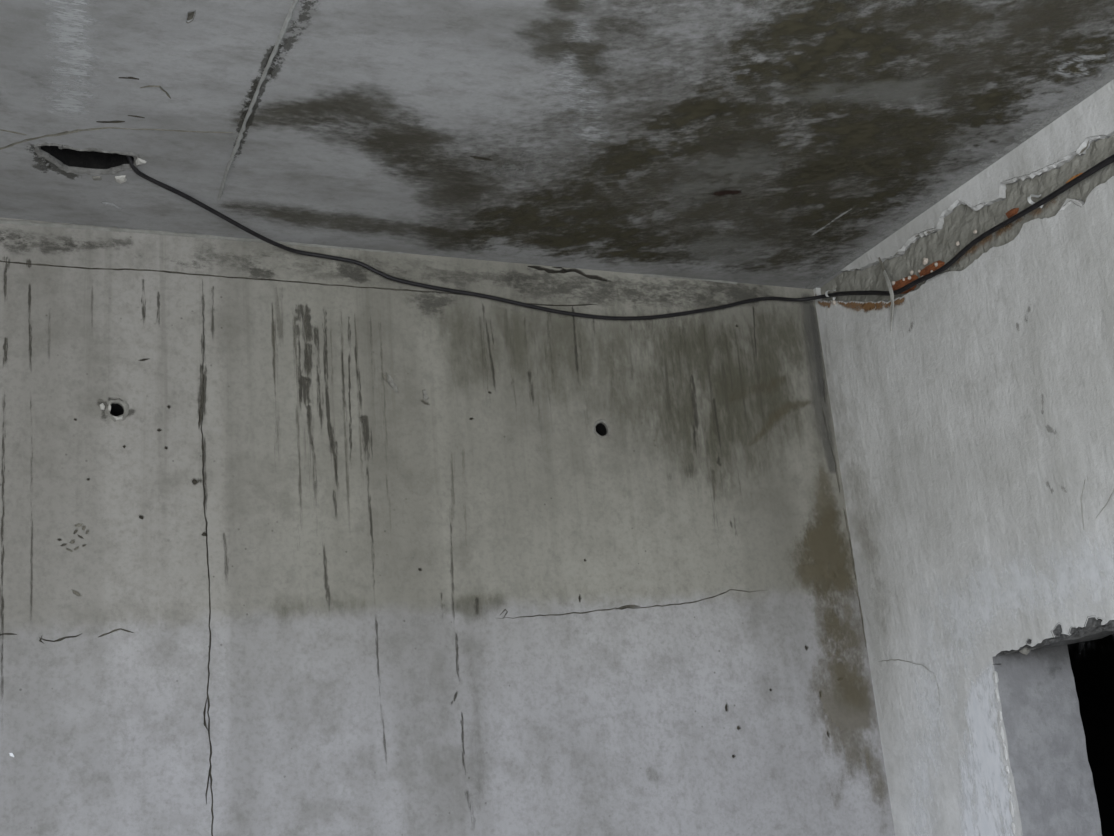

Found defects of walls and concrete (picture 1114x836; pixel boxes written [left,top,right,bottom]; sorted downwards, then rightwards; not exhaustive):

peeling [1057,55,1105,77]
crack [119,77,171,99]
crack [0,115,233,150]
water stain [226,0,1114,289]
flaking render [821,135,1114,308]
crack [527,266,611,306]
rust [815,295,904,311]
water stain [296,305,372,512]
crack [500,589,767,619]
flaking render [1047,616,1114,643]
water stain [820,607,870,764]